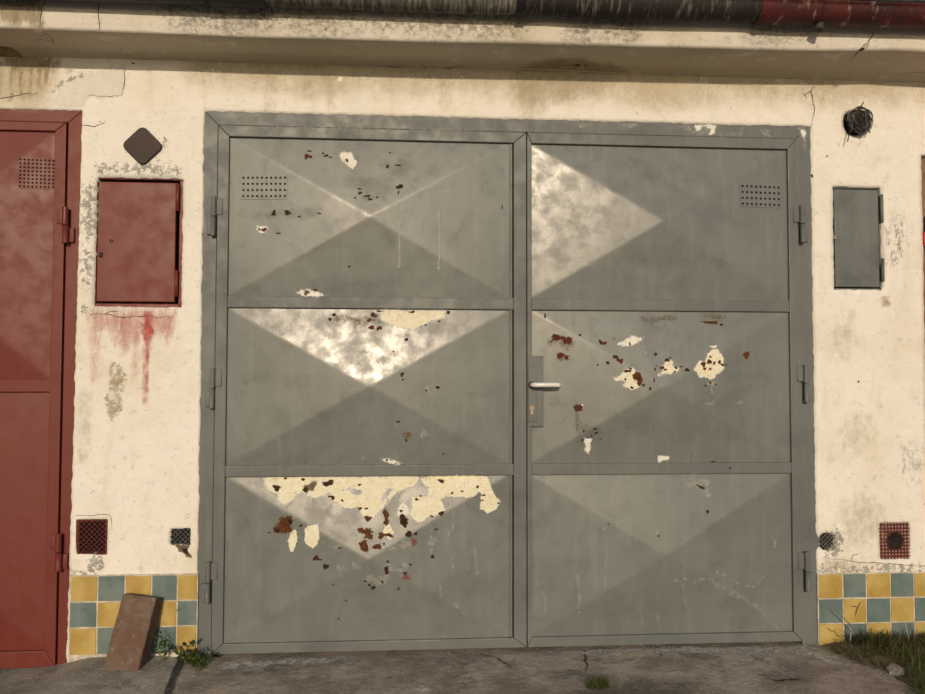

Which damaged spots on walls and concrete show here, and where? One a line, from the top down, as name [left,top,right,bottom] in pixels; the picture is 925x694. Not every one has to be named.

leakage [199,60,775,101]
peeling [367,309,450,341]
rust [551,334,581,360]
peeling [613,345,727,391]
spalling [104,363,125,421]
peeling [262,458,500,552]
peeling [287,524,329,569]